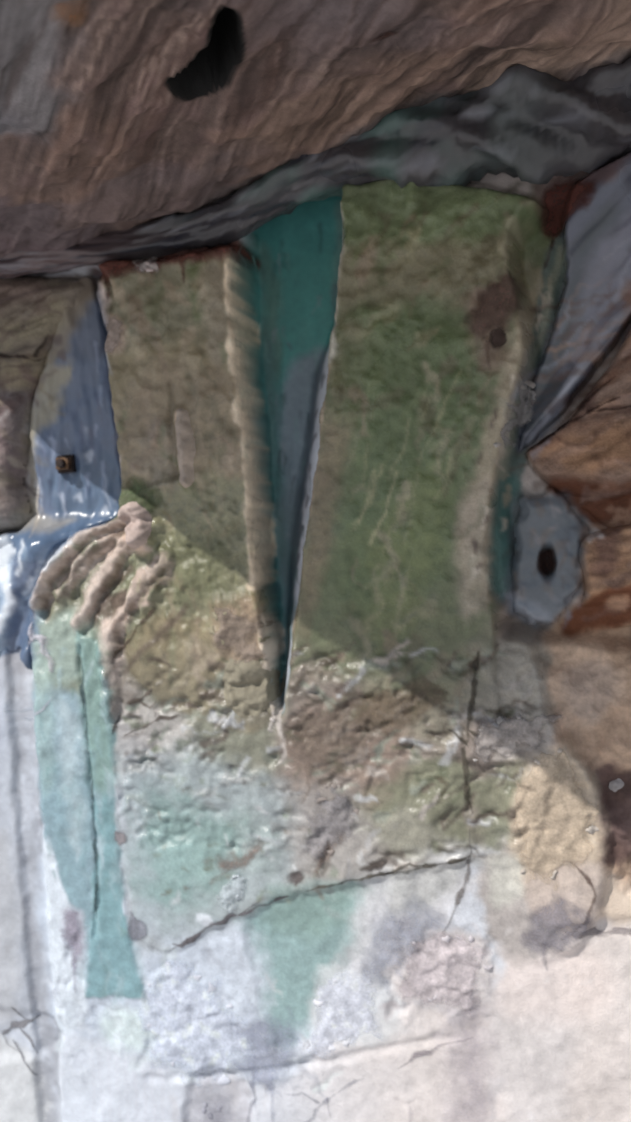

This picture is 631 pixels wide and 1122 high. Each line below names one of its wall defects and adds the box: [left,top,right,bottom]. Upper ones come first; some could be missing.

rust [542,180,594,247]
crack [455,654,479,809]
crack [317,856,470,905]
crack [175,896,288,947]
crack [3,1008,39,1071]